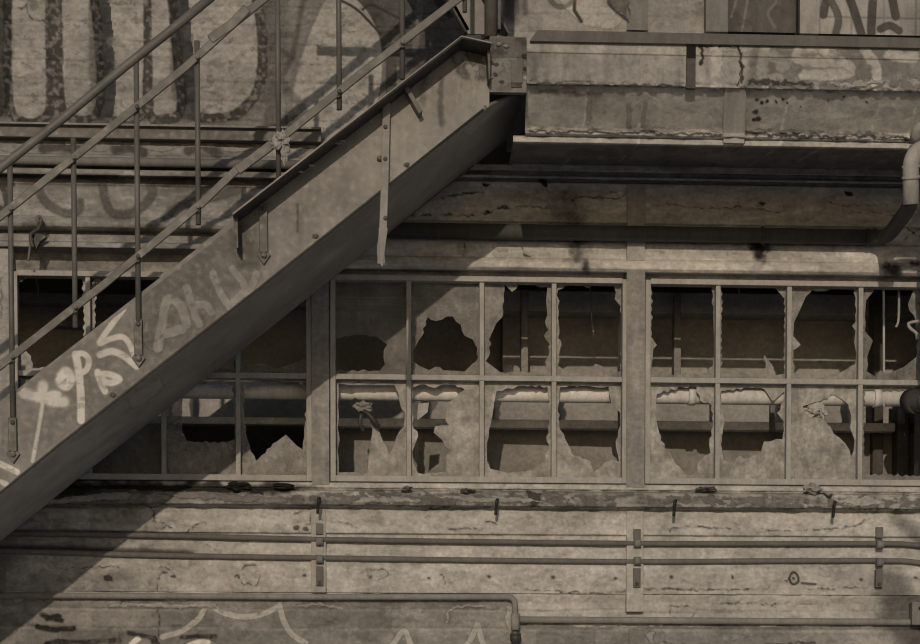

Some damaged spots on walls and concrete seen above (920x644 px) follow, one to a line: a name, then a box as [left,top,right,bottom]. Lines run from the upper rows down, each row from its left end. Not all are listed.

crack [698,46,745,85]
peeling [45,485,620,509]
peeling [645,493,920,511]